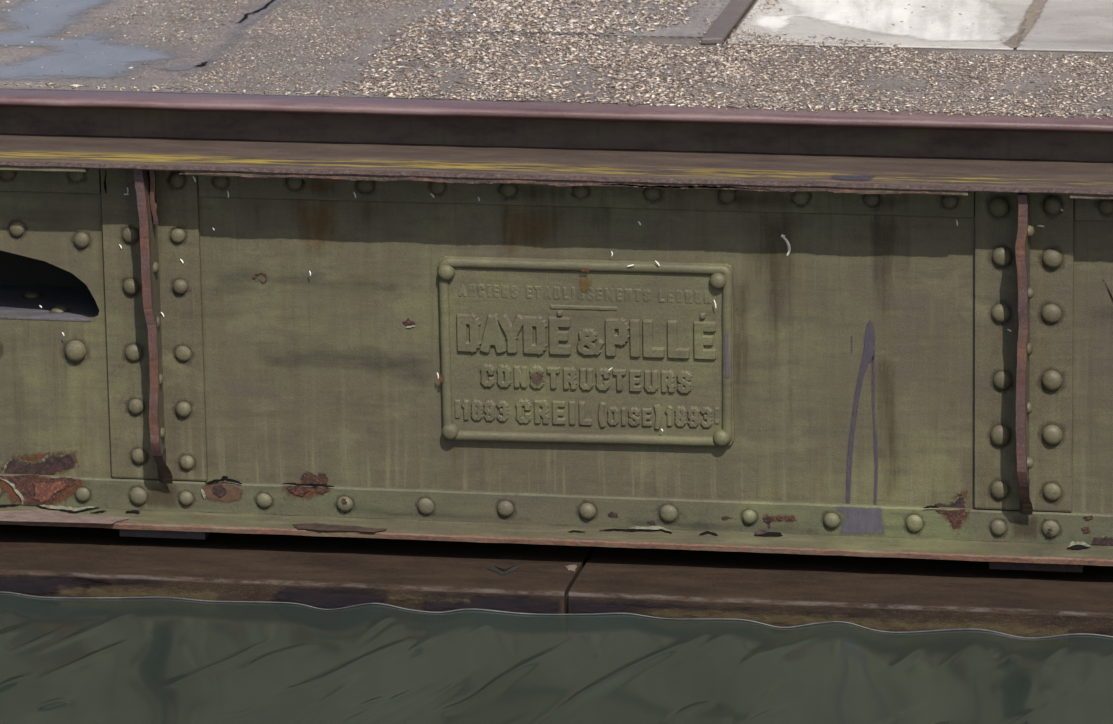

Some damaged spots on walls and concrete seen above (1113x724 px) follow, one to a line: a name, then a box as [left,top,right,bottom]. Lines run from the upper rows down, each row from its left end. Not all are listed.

crack [162,0,283,70]
corrosion [0,452,82,506]
corrosion [283,471,335,498]
peeling [0,509,129,524]
peeling [292,523,387,532]
corrosion [763,515,795,528]
corrosion [923,493,970,528]
corrosion [1081,515,1113,546]